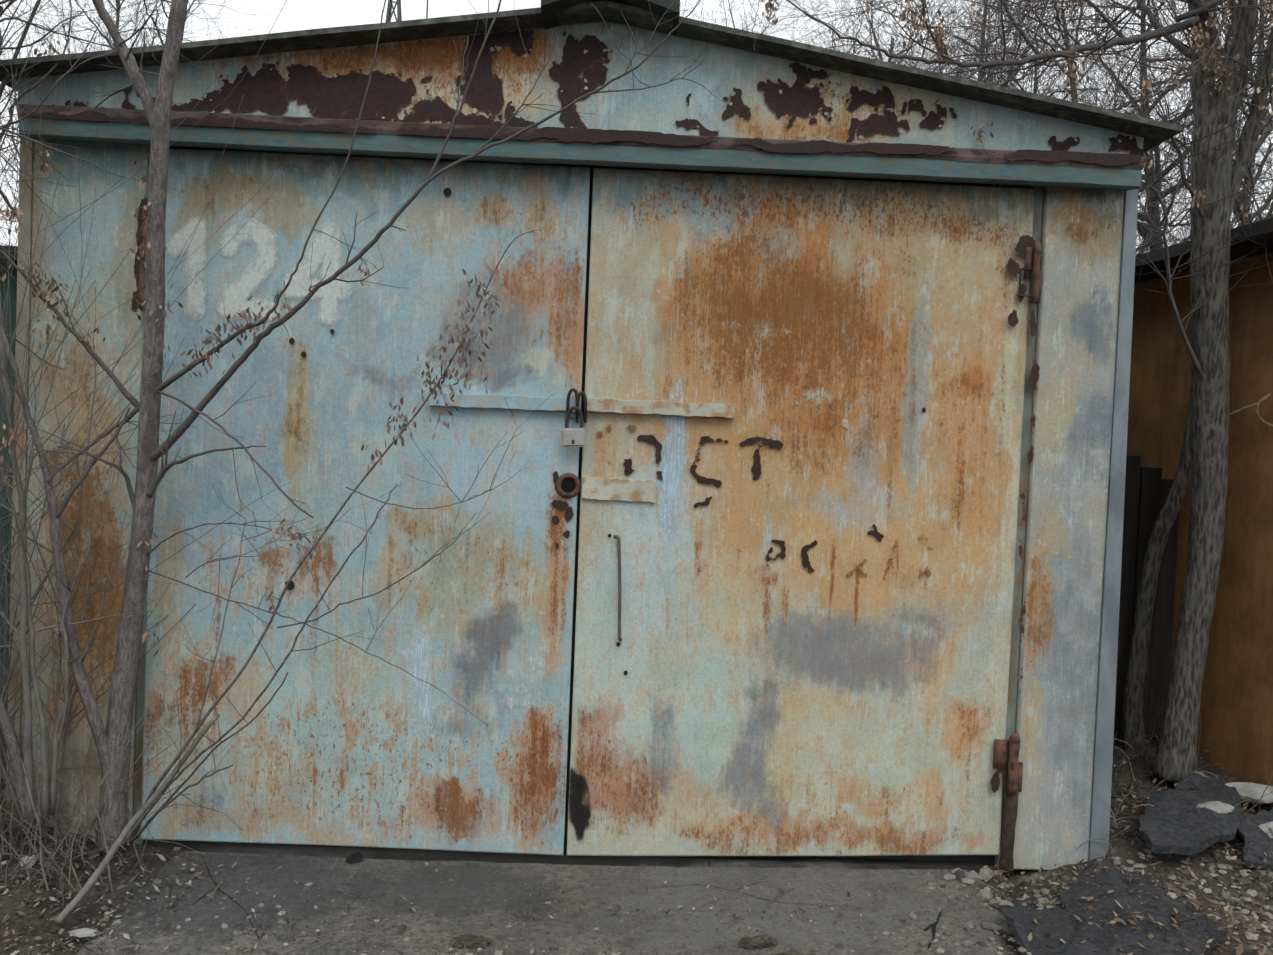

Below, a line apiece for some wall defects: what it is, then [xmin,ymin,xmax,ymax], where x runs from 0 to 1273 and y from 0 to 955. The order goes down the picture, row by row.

peeling [28,87,149,123]
peeling [170,30,751,146]
peeling [733,63,958,155]
peeling [1004,134,1144,166]
corrosion [487,230,582,360]
corrosion [674,202,926,505]
corrosion [46,439,131,701]
corrosion [259,535,336,653]
corrosion [145,600,236,765]
corrosion [428,777,492,842]
corrosion [511,708,663,850]
corrosion [680,788,962,855]